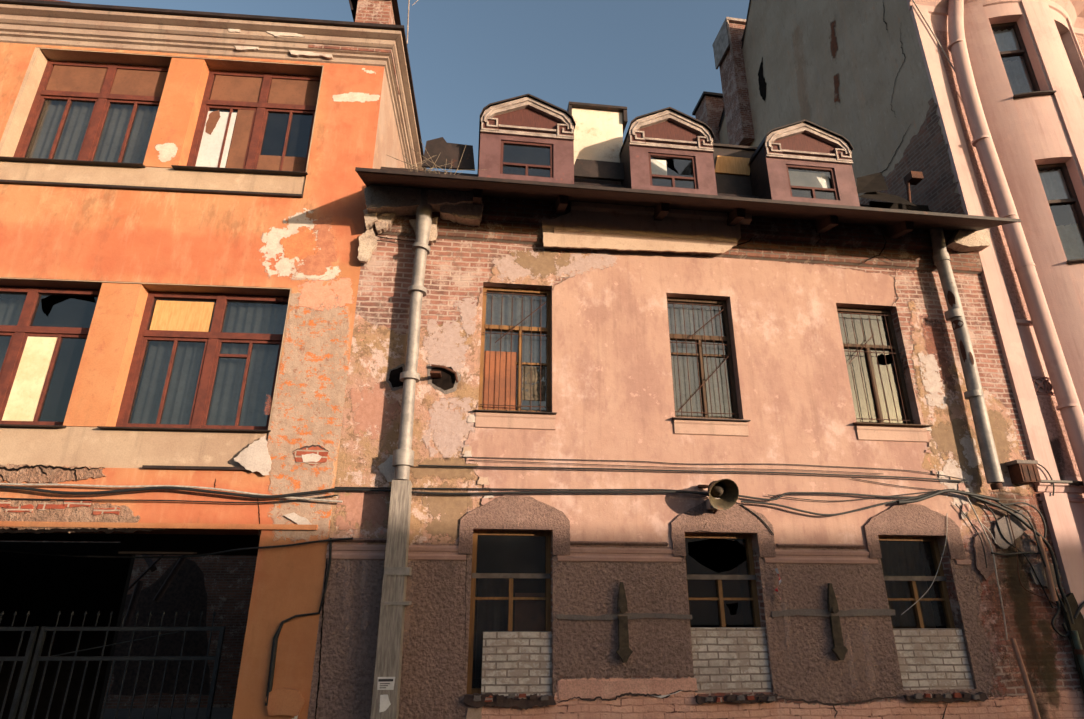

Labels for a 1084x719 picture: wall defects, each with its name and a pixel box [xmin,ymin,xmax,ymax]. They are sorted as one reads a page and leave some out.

peeling [259,208,355,311]
flaking render [293,445,329,465]
peeling [336,486,390,530]
peeling [350,363,405,441]
peeling [411,297,494,541]
flaking render [918,315,957,409]
peeling [923,418,985,519]
peeling [987,410,1012,472]
water stain [996,533,1047,719]